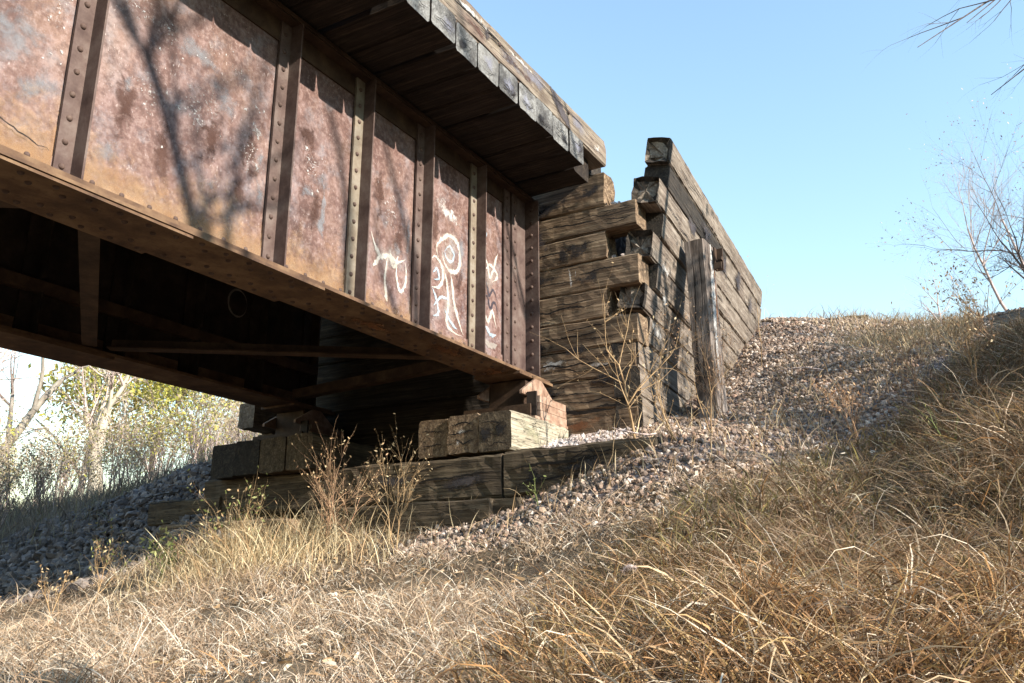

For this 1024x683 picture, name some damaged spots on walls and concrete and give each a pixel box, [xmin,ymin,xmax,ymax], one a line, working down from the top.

rust [116,79,135,121]
rust [0,118,57,165]
rust [155,132,168,176]
rust [202,121,218,152]
rust [235,135,256,205]
rust [301,129,314,149]
rust [83,150,261,256]
rust [374,181,384,214]
rust [286,248,344,292]